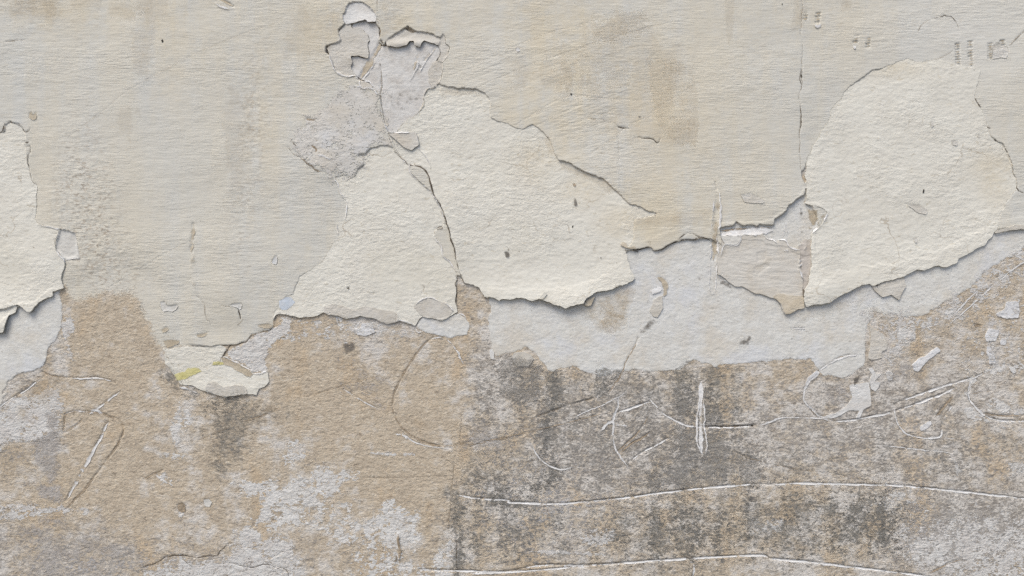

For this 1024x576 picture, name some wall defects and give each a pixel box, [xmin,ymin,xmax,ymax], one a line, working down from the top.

peeling [160,2,1024,429]
peeling [0,112,80,452]
spalling [156,401,194,486]
spalling [0,504,102,521]
spalling [143,439,457,576]
spalling [531,526,616,556]
spalling [861,469,1024,576]